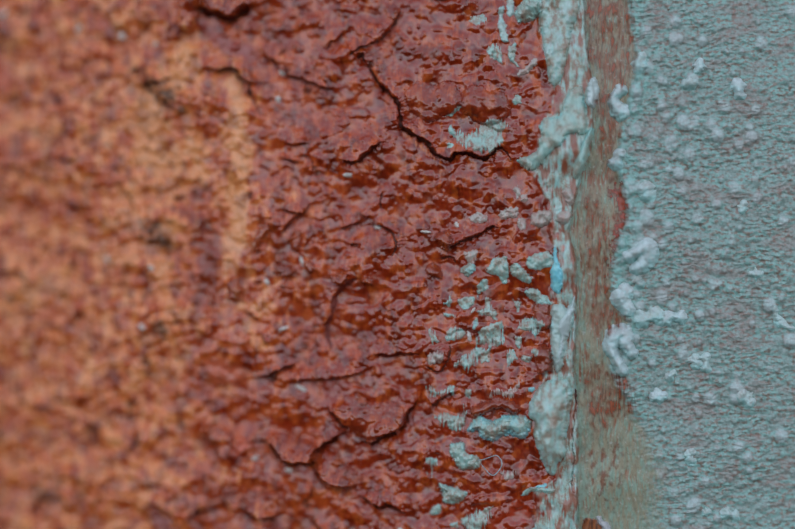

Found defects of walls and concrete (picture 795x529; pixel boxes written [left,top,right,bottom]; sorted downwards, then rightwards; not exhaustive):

crack [202,7,249,25]
corrosion [586,0,634,86]
crack [326,9,511,161]
peeling [586,76,600,108]
crack [344,142,381,165]
peeling [572,127,595,179]
corrosion [585,178,628,335]
crack [324,278,357,349]
crack [253,346,451,382]
crack [286,393,453,529]
spalling [487,496,533,529]
peeling [582,516,611,529]